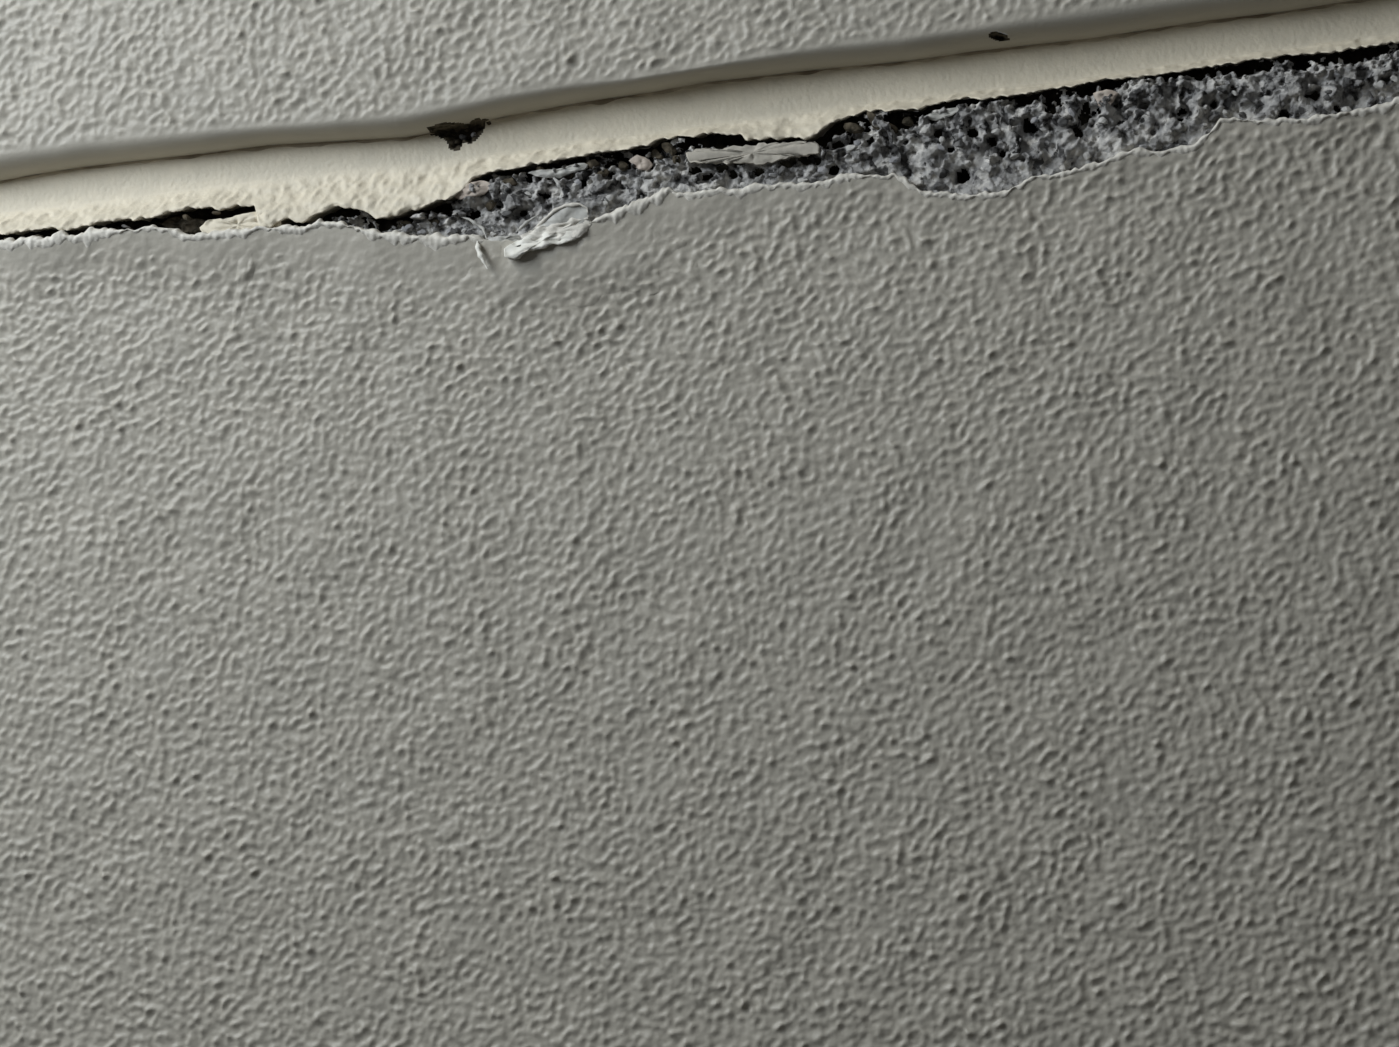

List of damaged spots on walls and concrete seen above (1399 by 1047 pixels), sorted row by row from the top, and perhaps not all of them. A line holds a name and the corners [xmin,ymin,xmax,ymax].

spalling [989,31,1010,41]
spalling [271,44,1399,269]